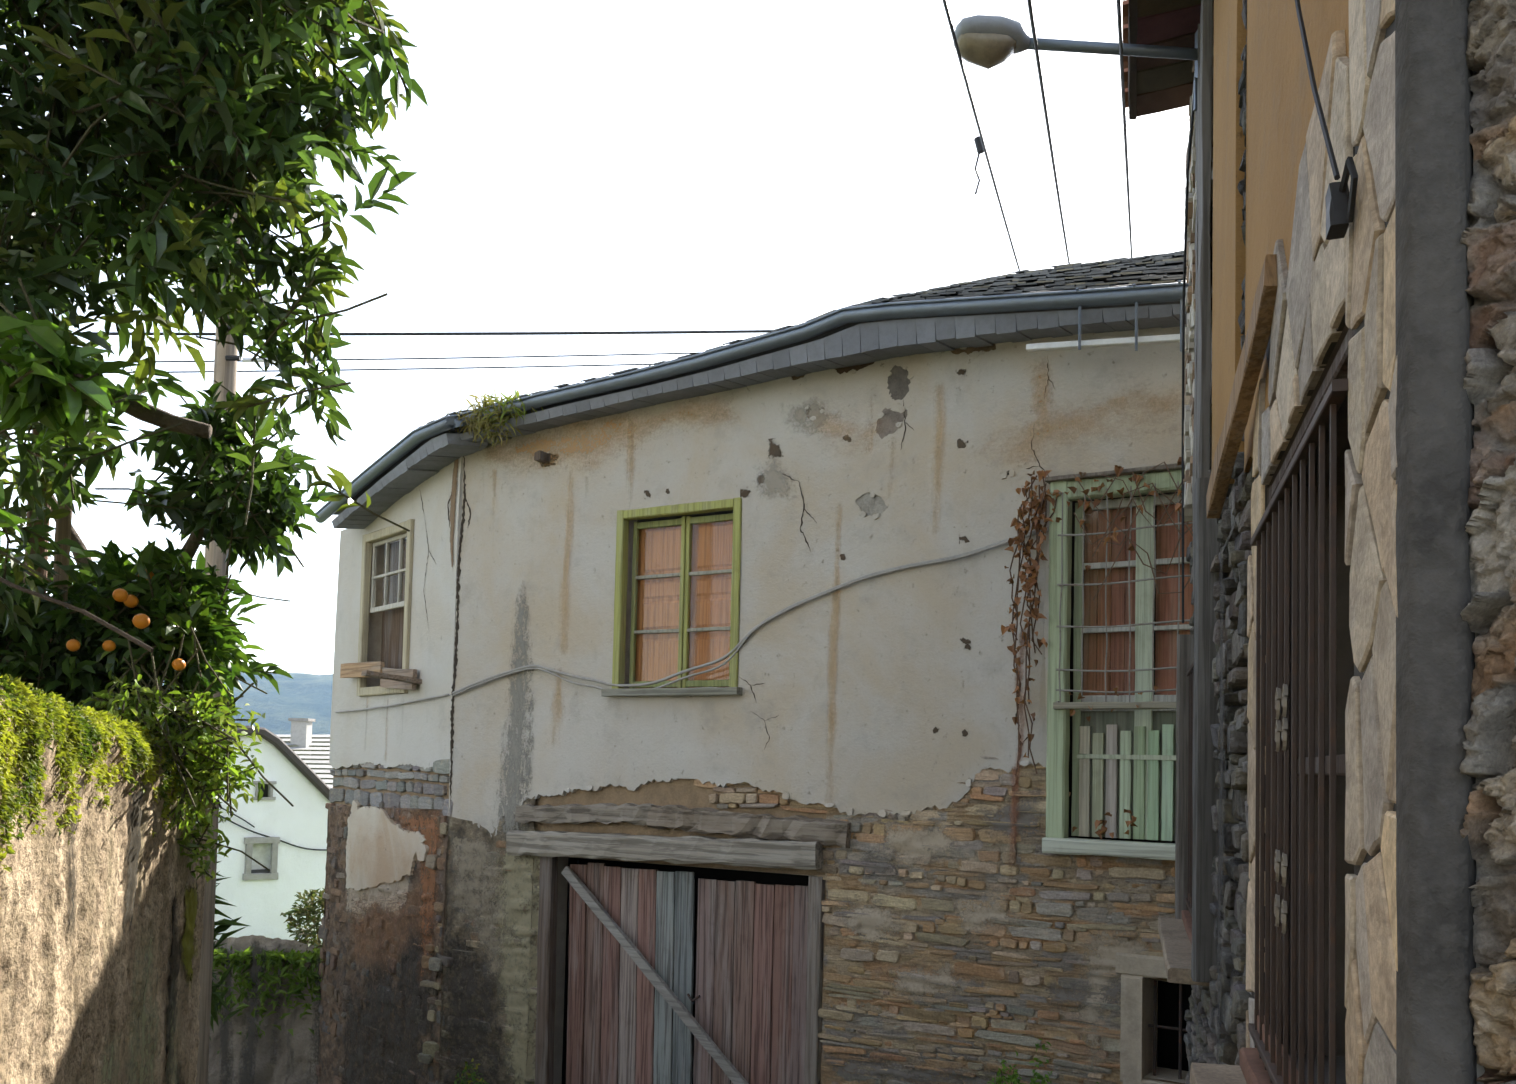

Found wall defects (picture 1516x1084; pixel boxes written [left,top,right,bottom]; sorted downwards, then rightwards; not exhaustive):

flaking render [740,474,765,498]
flaking render [769,438,781,457]
crack [783,474,817,548]
spalling [856,492,888,519]
spalling [835,362,914,439]
water stain [498,590,533,838]
water stain [67,782,81,935]
water stain [123,785,144,932]
water stain [101,884,198,1084]
flaking render [346,796,540,1084]
flaking render [693,756,1175,1084]